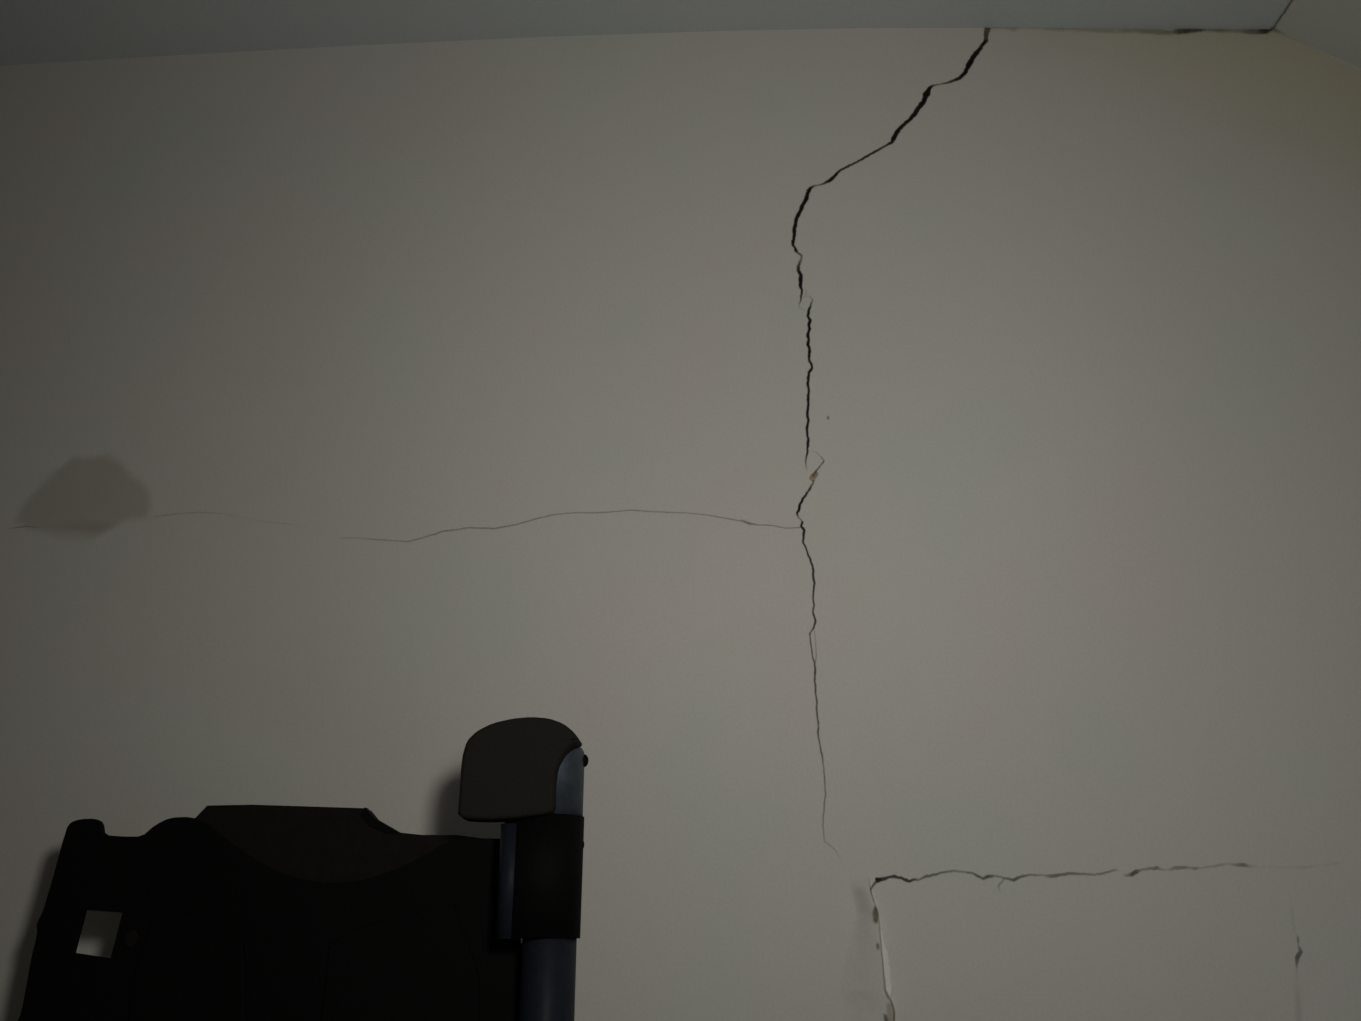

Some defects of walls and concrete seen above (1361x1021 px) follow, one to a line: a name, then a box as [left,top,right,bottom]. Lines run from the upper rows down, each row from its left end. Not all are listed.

crack [791,28,991,758]
crack [875,875,916,883]